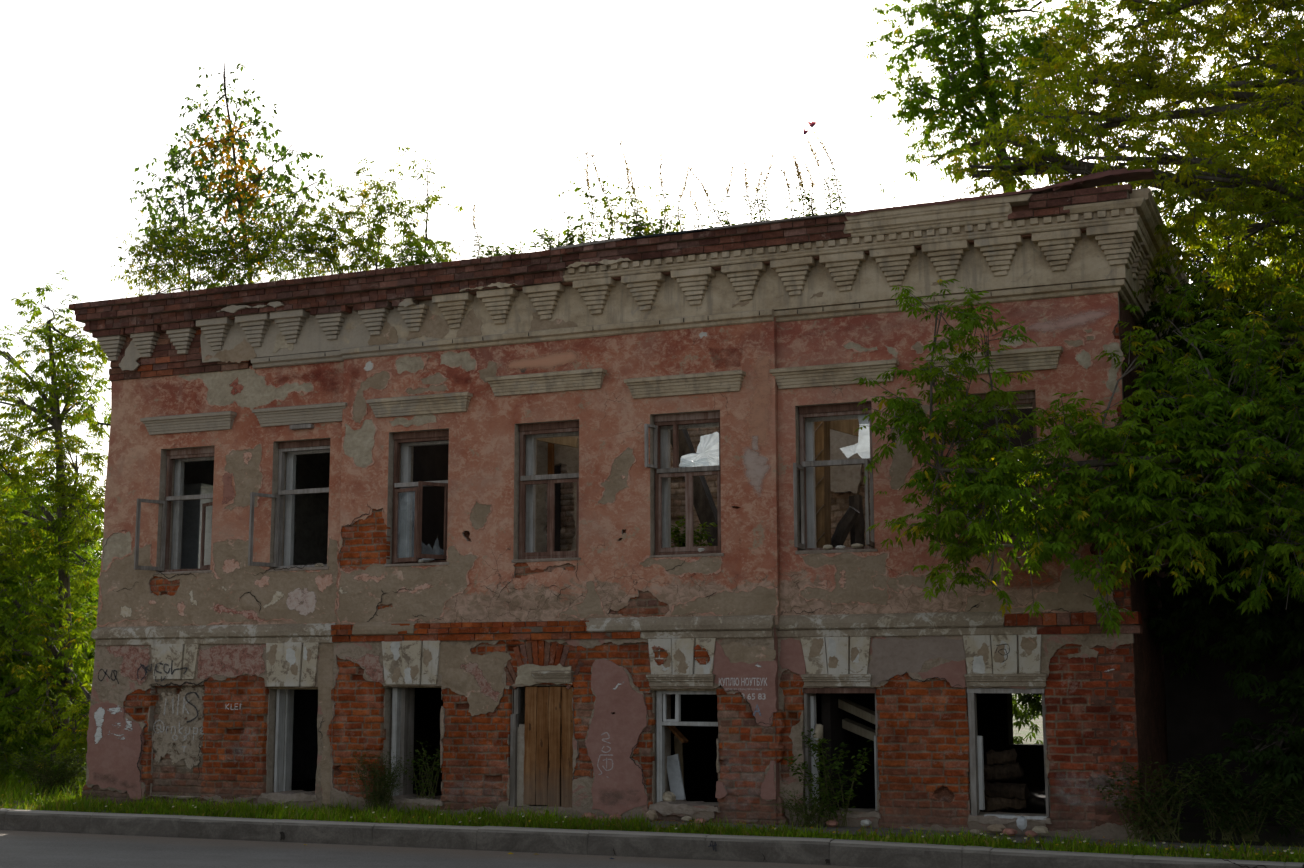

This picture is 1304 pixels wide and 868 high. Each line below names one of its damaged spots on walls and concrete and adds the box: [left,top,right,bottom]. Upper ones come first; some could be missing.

flaking render [68,215,851,410]
peeling [222,443,264,511]
peeling [342,414,437,469]
peeling [82,499,804,825]
flaking render [874,672,971,828]
flaking render [963,540,1143,832]